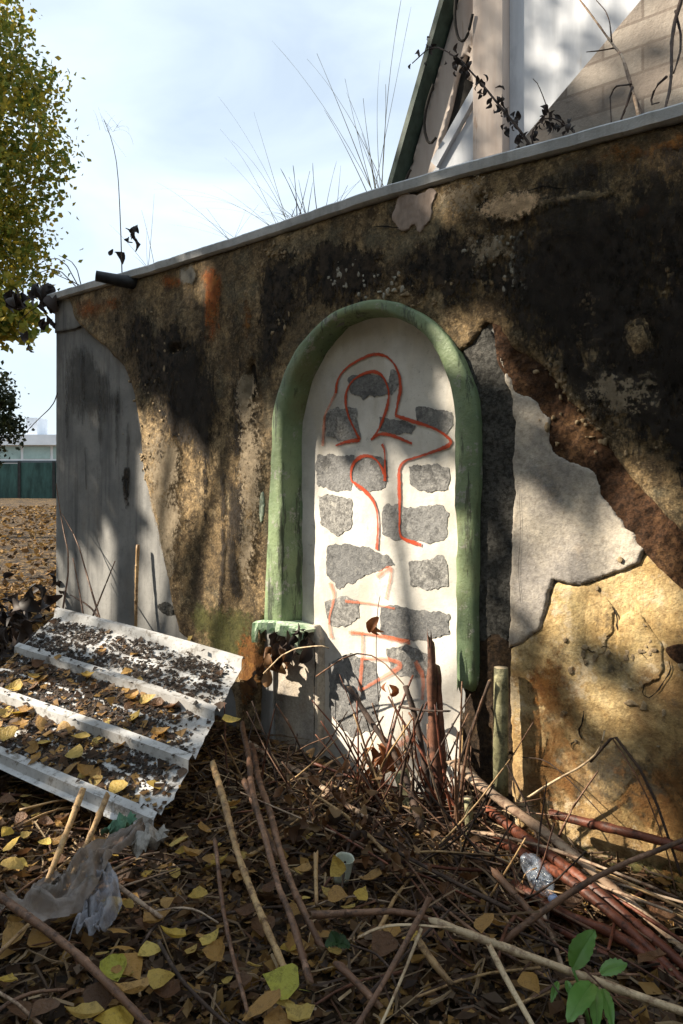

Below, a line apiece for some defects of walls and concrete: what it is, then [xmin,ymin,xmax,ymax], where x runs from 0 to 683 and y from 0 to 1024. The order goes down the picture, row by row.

flaking render [392,188,437,233]
corrosion [203,268,222,340]
leakage [108,145,683,719]
flaking render [461,322,683,835]
crack [587,607,619,653]
crack [642,654,671,698]